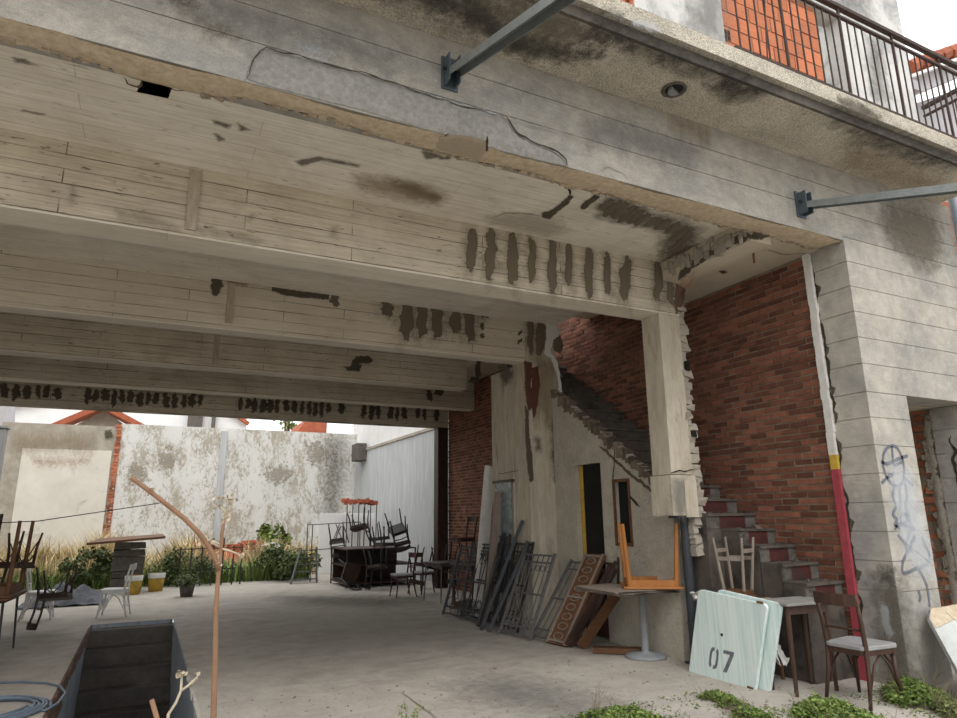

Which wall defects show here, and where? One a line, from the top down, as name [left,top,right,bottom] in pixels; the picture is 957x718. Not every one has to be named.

crack [245,47,588,219]
peeling [0,17,840,287]
water stain [831,109,957,166]
spalling [210,279,247,296]
spalling [272,287,340,307]
spalling [524,324,653,492]
spalling [677,303,708,556]